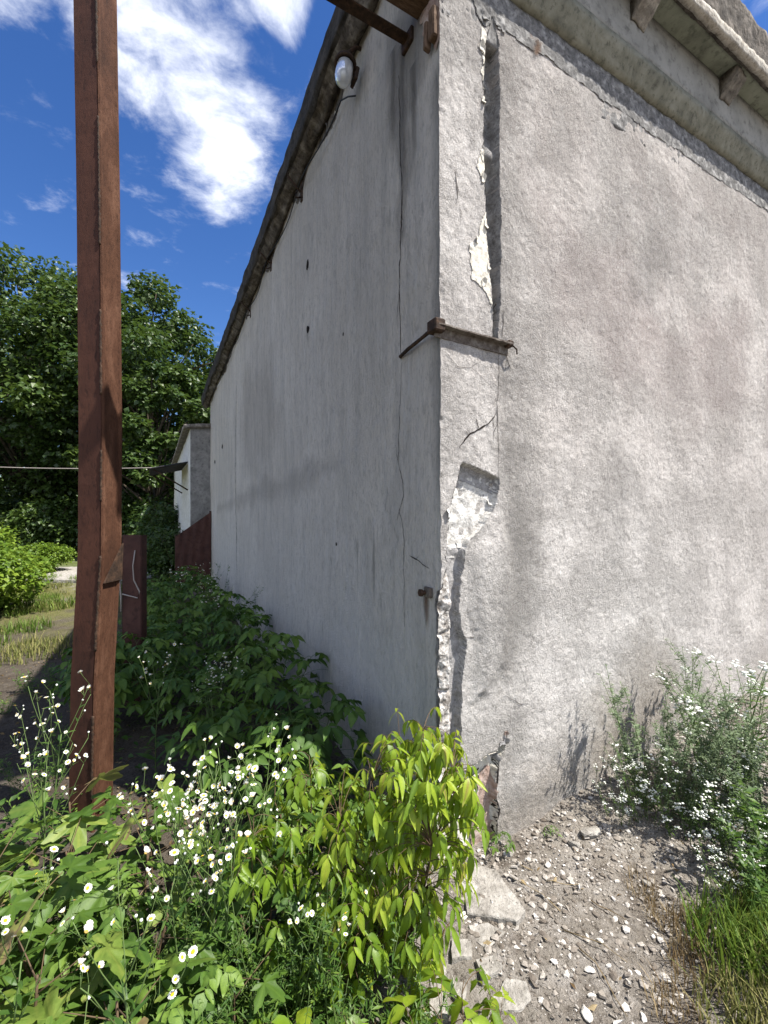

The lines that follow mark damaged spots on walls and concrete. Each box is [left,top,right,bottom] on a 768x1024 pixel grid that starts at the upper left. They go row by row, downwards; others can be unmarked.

crack [396,104,428,585]
crack [449,24,511,477]
peeling [469,212,493,304]
flaking render [474,0,768,210]
flaking render [435,463,510,859]